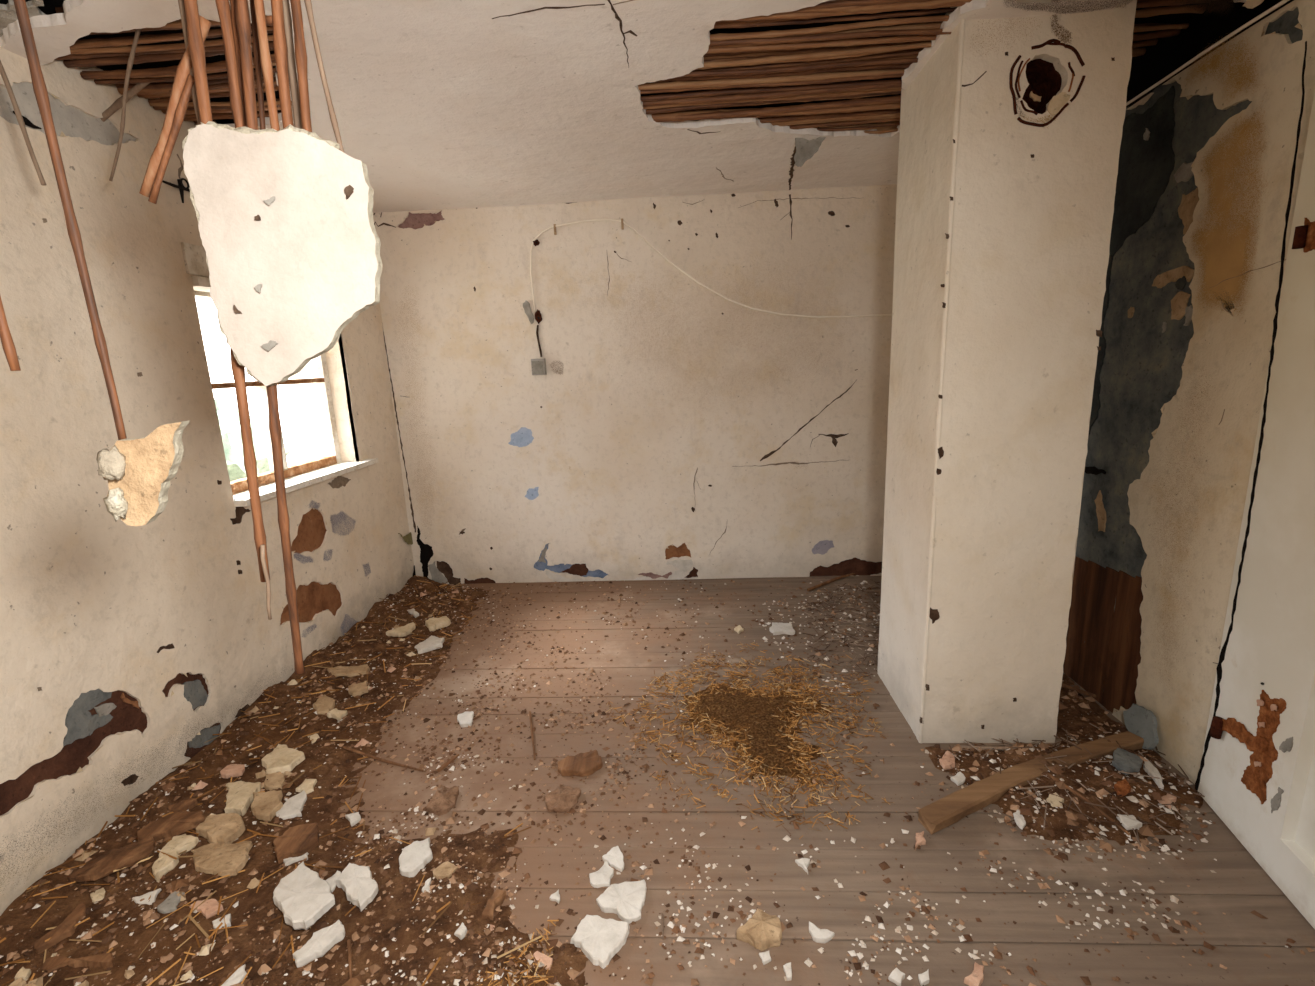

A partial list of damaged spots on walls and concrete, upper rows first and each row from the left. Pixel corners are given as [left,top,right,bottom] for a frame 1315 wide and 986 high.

crack [492,0,637,66]
peeling [0,82,136,145]
peeling [1076,81,1252,578]
crack [732,369,858,467]
flaking render [291,508,327,554]
peeling [534,543,698,582]
flaking render [810,540,882,576]
flaking render [280,581,342,625]
flaking render [162,672,209,711]
flaking render [0,688,147,816]